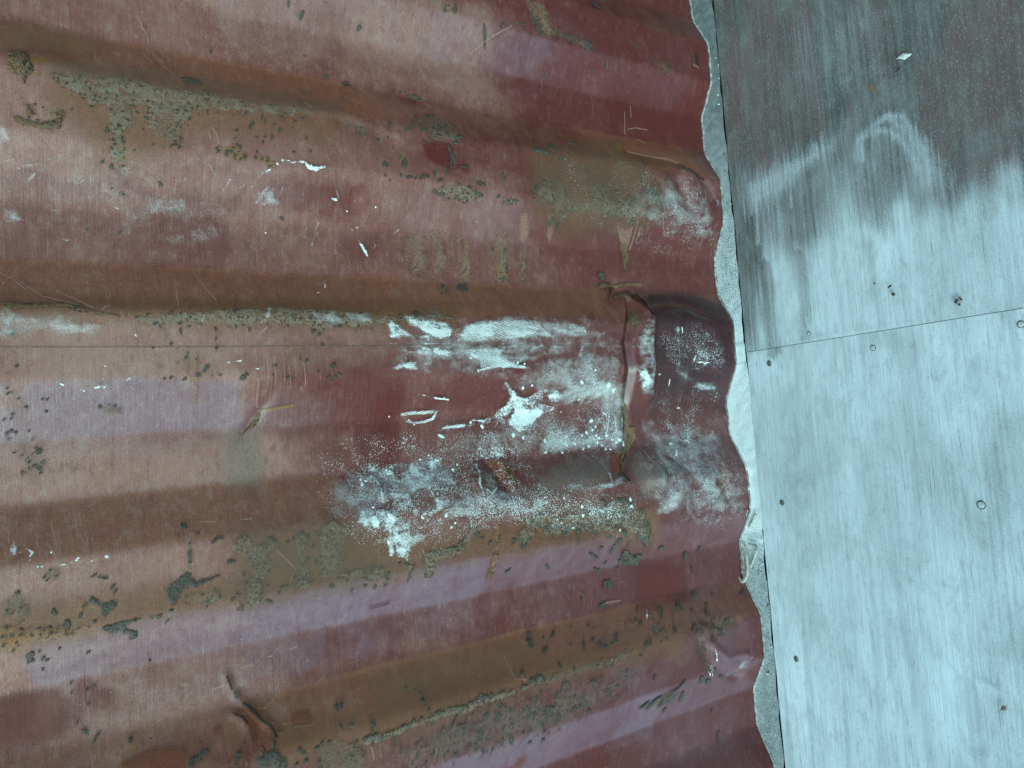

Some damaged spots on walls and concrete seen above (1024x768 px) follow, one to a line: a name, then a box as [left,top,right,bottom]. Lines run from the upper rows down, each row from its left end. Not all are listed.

corrosion [345,114,486,203]
corrosion [531,141,659,233]
corrosion [0,301,456,403]
corrosion [0,492,664,671]
corrosion [227,591,742,768]